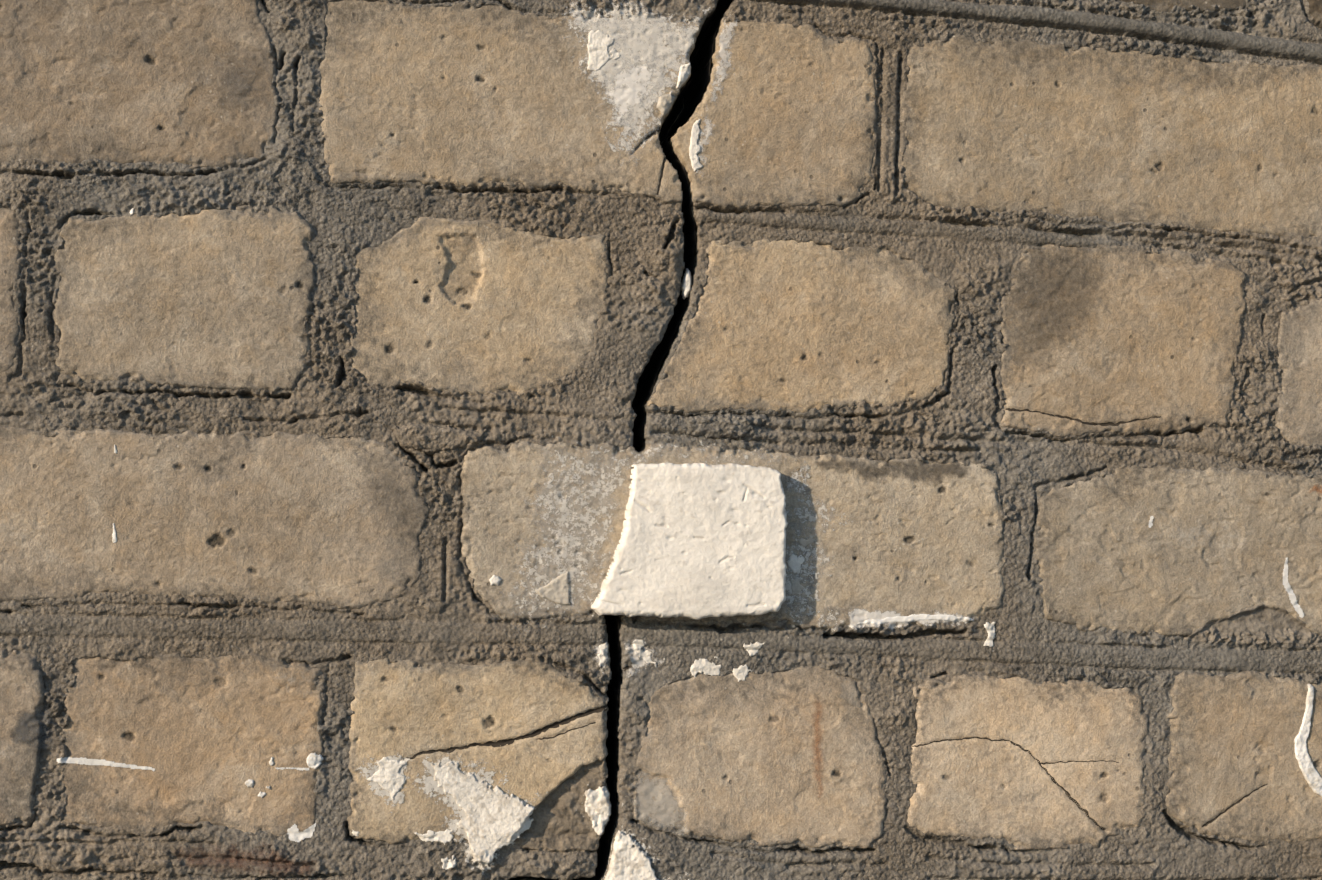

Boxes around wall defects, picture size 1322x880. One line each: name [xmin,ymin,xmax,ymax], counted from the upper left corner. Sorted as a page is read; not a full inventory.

peeling [587,30,691,128]
crack [631,0,730,448]
crack [401,615,633,880]
peeling [355,753,702,880]